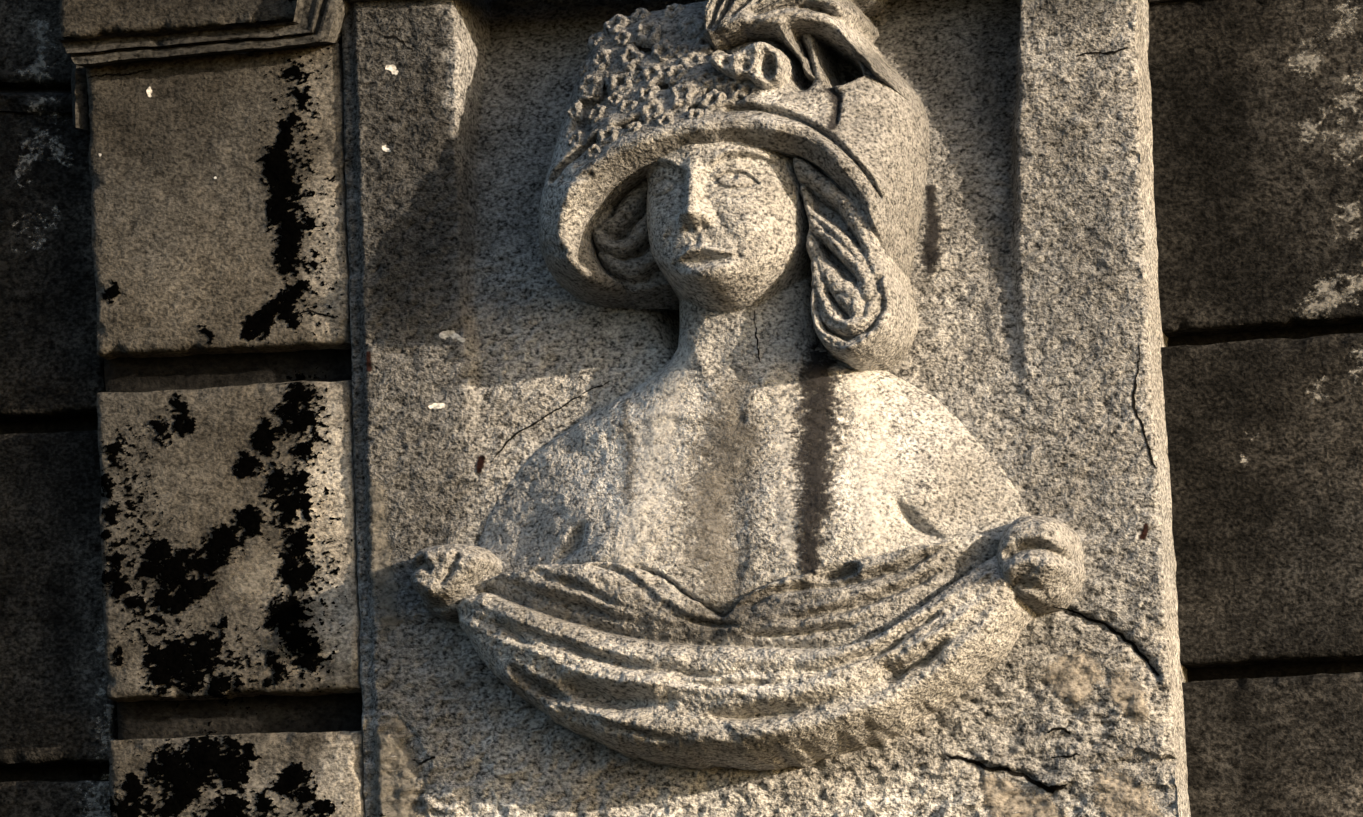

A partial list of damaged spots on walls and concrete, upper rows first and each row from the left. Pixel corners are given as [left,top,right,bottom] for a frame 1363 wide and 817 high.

damp [1289,52,1321,72]
damp [1302,76,1363,159]
damp [240,34,354,355]
damp [1340,203,1360,240]
damp [1305,276,1363,319]
damp [197,325,215,344]
crack [490,381,610,463]
damp [775,342,896,578]
damp [86,368,368,817]
crack [1054,607,1159,676]
crack [947,727,1080,794]